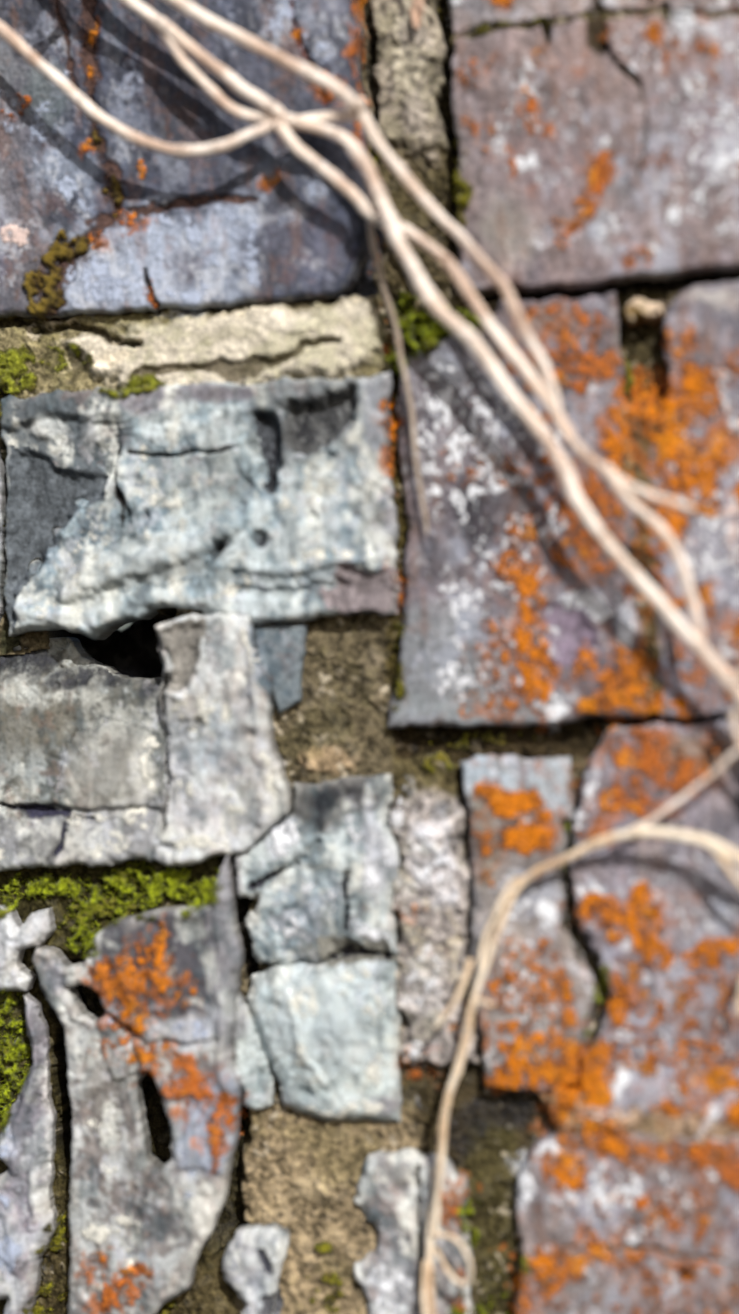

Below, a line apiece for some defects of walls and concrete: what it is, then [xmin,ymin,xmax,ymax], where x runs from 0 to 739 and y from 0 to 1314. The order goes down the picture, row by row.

crack [34,0,259,322]
crack [290,0,329,106]
crack [542,22,551,44]
crack [586,0,648,181]
crack [647,0,671,23]
spalling [248,378,358,494]
spalling [0,445,116,629]
spalling [316,561,406,617]
peeling [0,613,308,1314]
crack [559,819,606,1020]